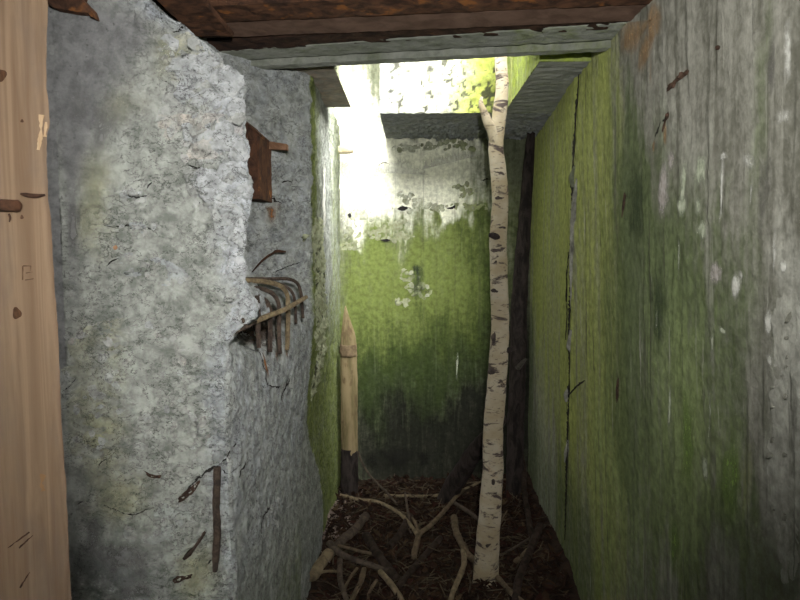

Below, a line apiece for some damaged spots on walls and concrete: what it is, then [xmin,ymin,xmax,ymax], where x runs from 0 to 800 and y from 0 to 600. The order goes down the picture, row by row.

spalling [155,32,329,401]
damp [659,156,673,211]
damp [678,167,686,213]
crack [564,74,585,540]
damp [732,273,742,295]